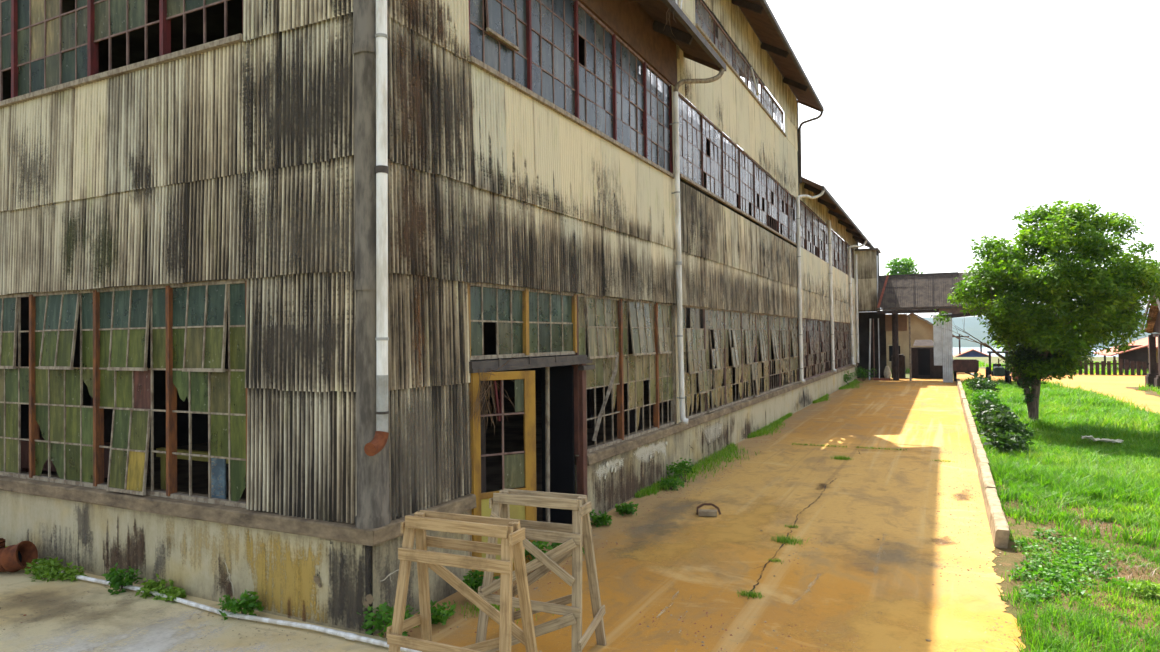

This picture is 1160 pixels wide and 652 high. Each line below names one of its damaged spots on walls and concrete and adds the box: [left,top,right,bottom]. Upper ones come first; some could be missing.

damp [14,128,55,214]
damp [129,146,154,202]
damp [162,198,192,286]
damp [390,0,466,301]
damp [477,122,631,283]
damp [40,505,414,630]
crack [751,478,837,591]